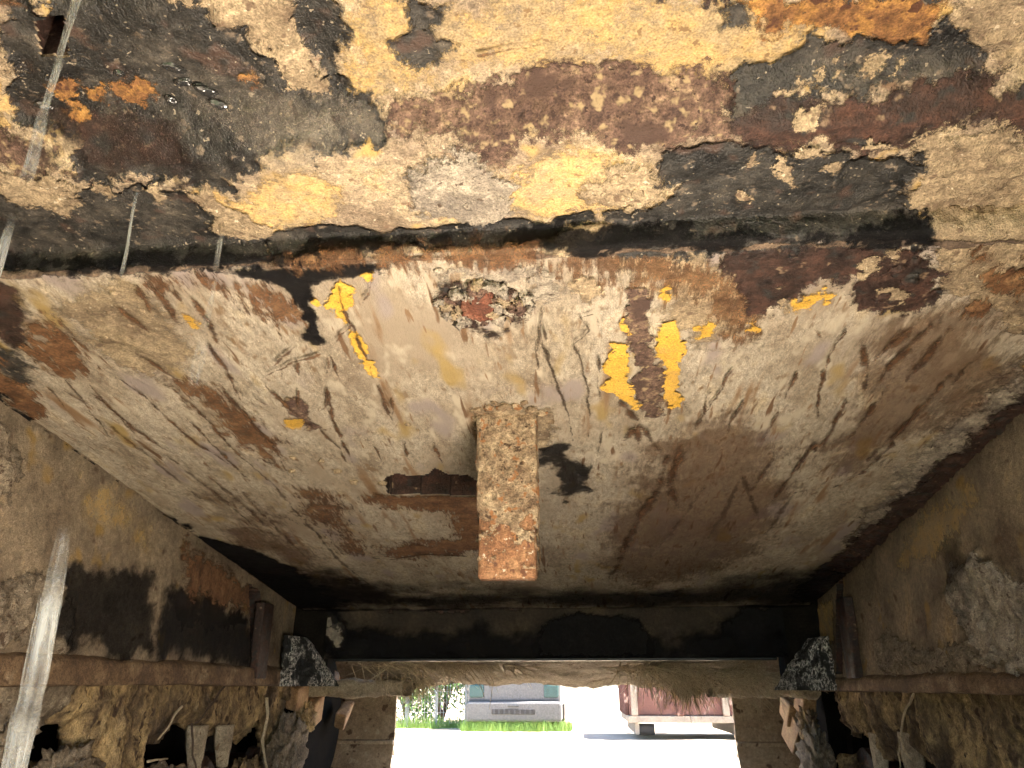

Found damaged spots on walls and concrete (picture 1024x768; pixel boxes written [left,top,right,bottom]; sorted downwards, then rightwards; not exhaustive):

rust [702,0,950,46]
rust [0,76,189,183]
rust [237,72,262,91]
rust [0,268,479,587]
damp [538,444,593,504]
crack [535,311,602,451]
rust [255,229,1024,592]
damp [182,524,306,582]